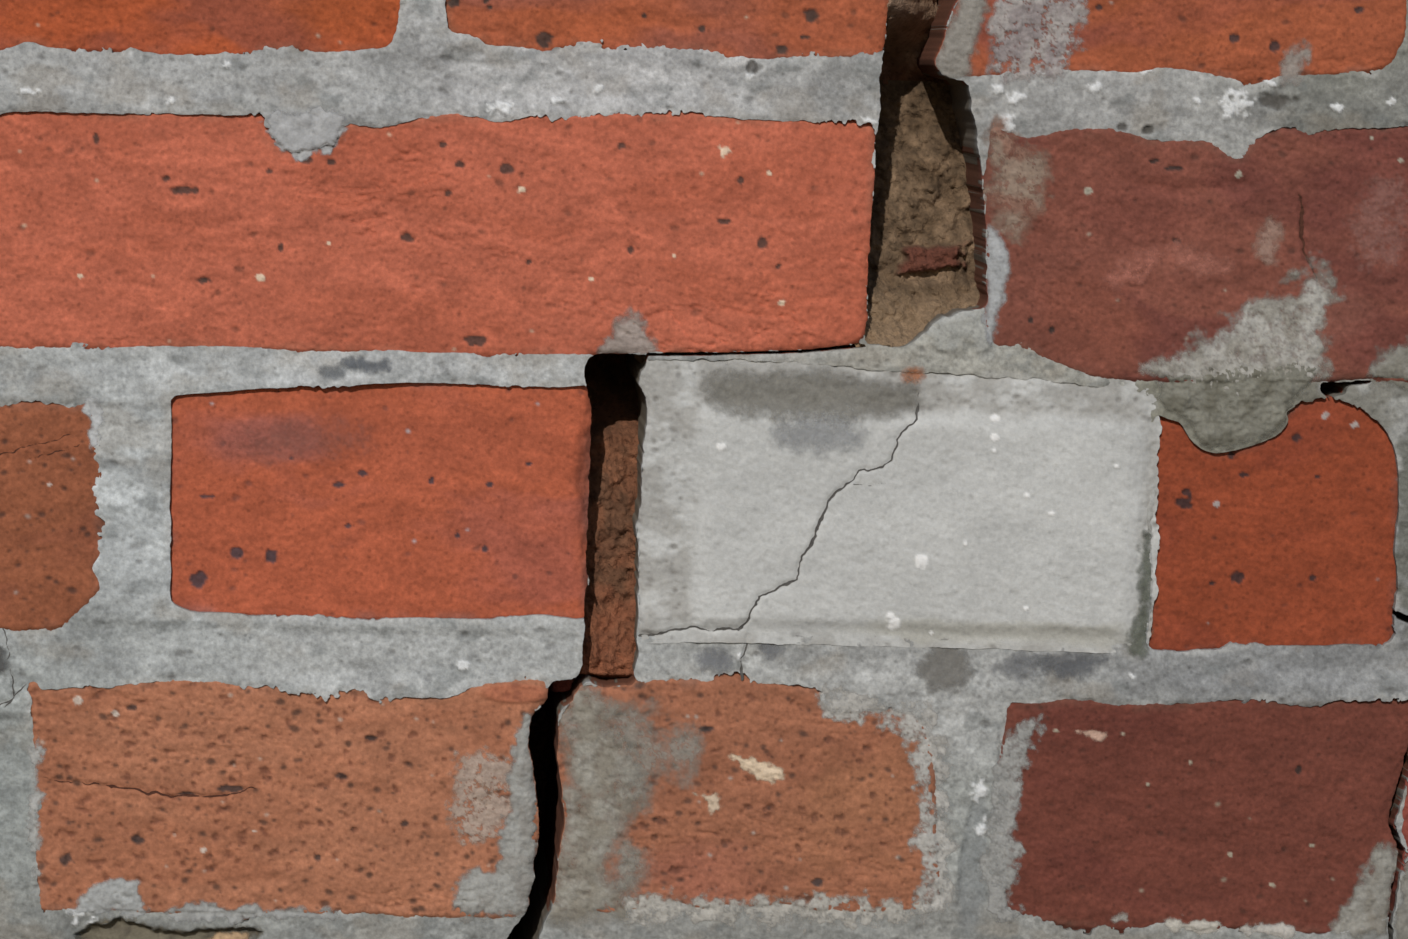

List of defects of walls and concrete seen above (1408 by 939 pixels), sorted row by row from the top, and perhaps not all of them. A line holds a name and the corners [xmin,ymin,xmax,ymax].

crack [840,0,980,347]
leakage [935,0,1089,83]
crack [529,352,919,835]